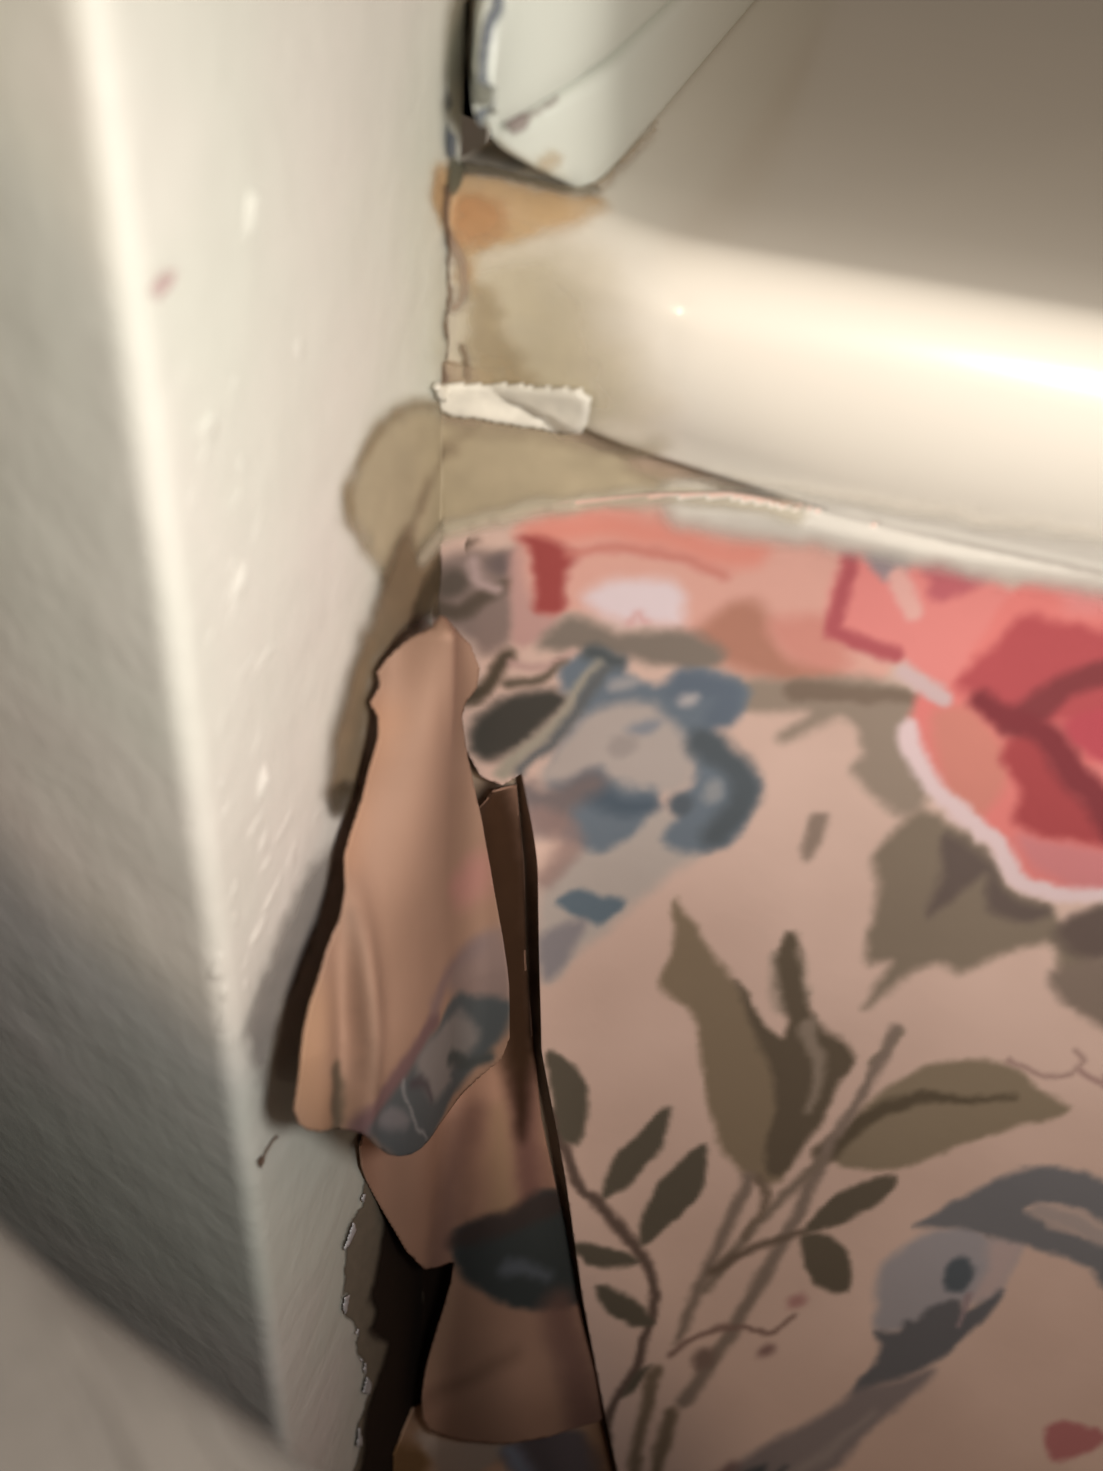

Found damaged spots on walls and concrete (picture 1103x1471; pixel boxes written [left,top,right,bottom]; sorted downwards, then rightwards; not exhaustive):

crack [443,0,655,382]
peeling [432,382,592,435]
leakage [331,405,679,816]
spalling [343,1182,454,1471]